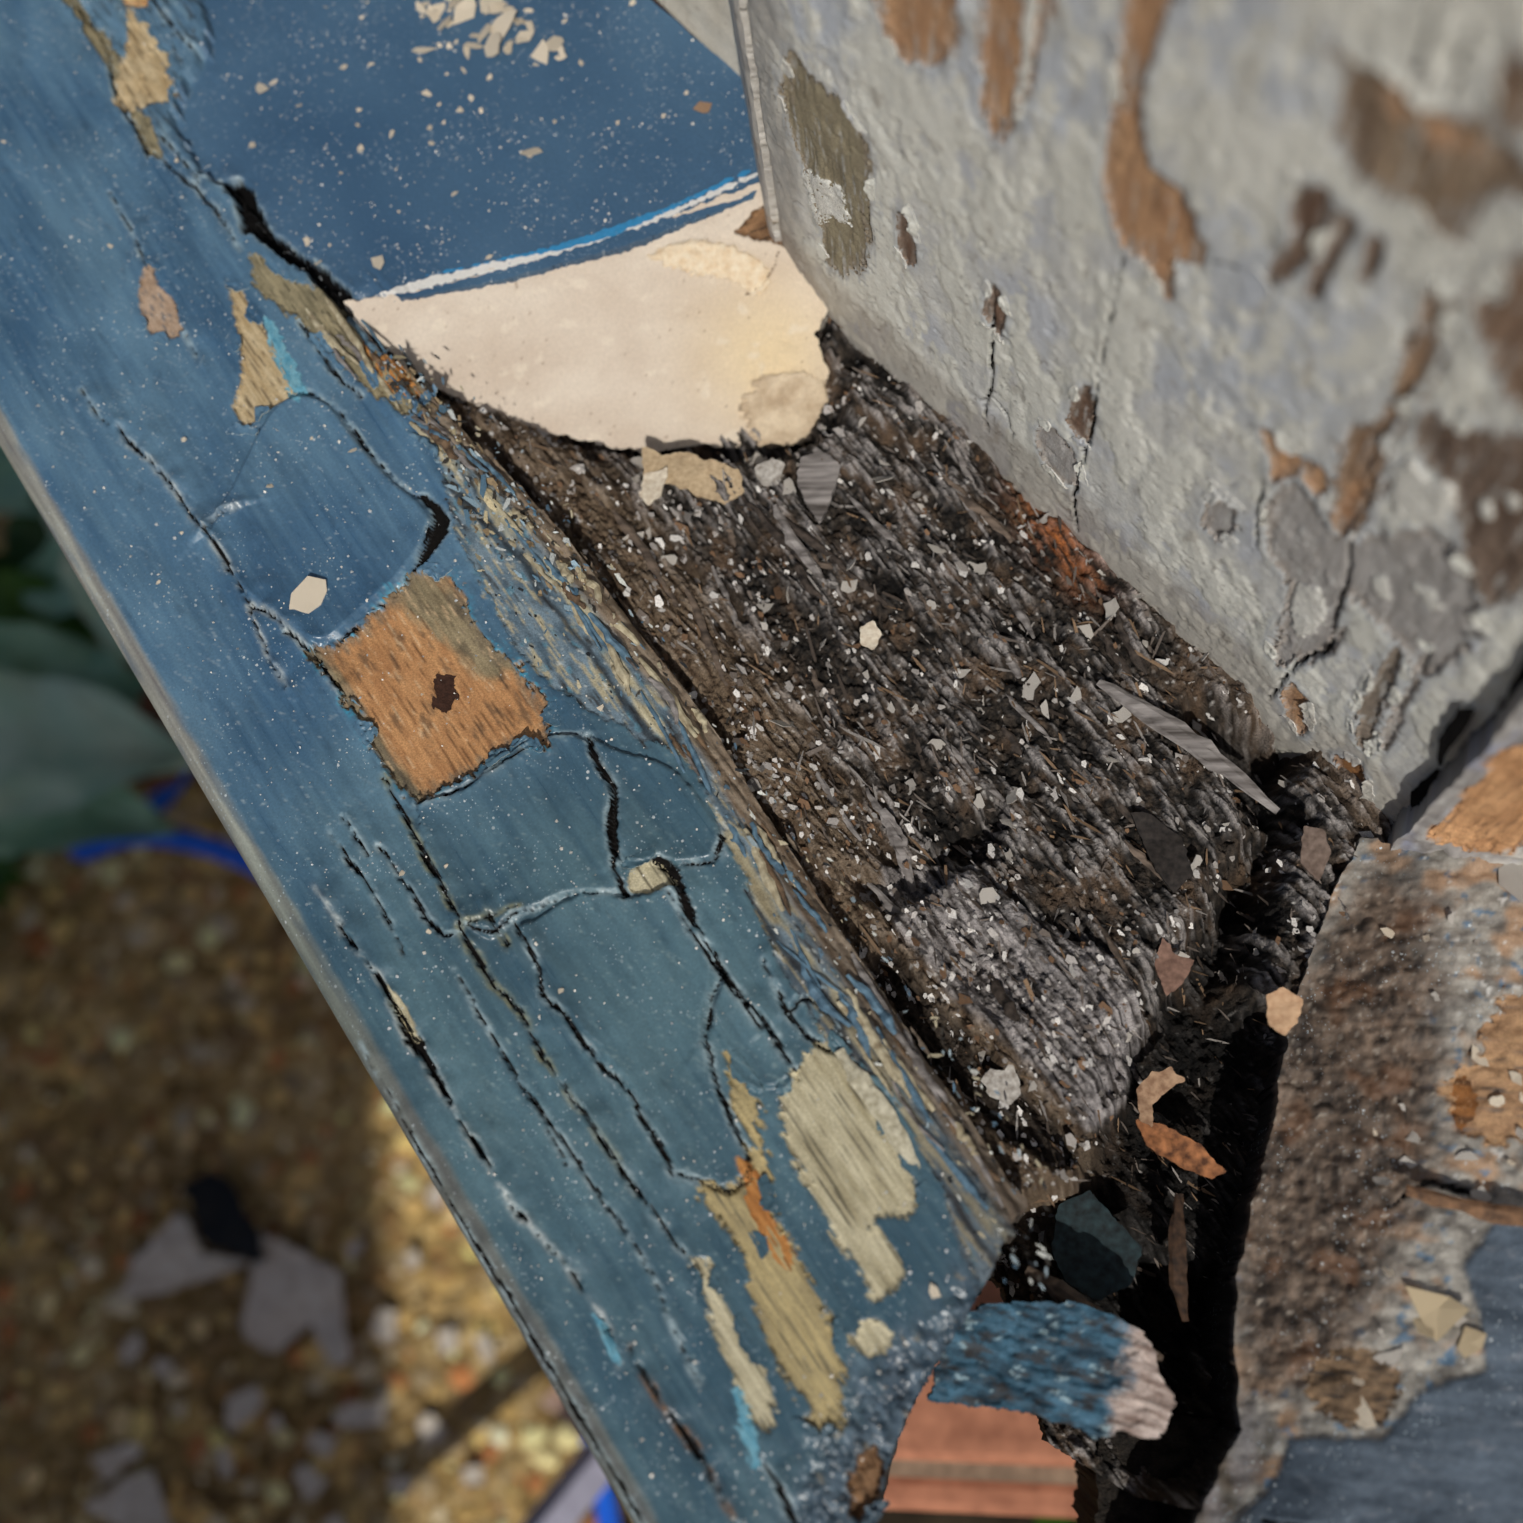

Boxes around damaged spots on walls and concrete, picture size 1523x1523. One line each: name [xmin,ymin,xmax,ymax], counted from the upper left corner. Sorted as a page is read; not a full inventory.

peeling [776,51,875,276]
peeling [223,252,439,436]
peeling [1200,249,1523,802]
peeling [303,562,561,803]
peeling [1021,672,1049,719]
crack [341,734,839,1274]
peeling [1264,987,1303,1039]
peeling [1436,986,1523,1148]
crack [389,1092,641,1520]
crack [604,1324,724,1501]
crack [766,1466,796,1523]
peeling [687,1030,933,1455]